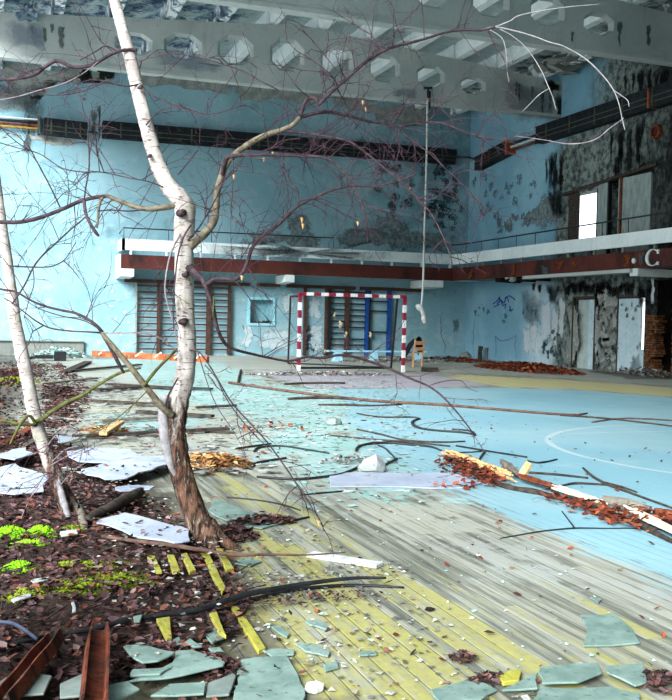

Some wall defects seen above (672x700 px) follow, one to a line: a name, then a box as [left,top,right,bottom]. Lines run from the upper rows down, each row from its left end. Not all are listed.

leakage [43,24,64,48]
spalling [533,53,588,76]
leakage [624,70,667,91]
leakage [610,120,654,188]
leakage [545,154,563,216]
peeling [243,214,320,248]
peeling [336,216,455,252]
spalling [497,191,558,233]
spalling [566,304,580,364]
leakage [522,280,652,367]